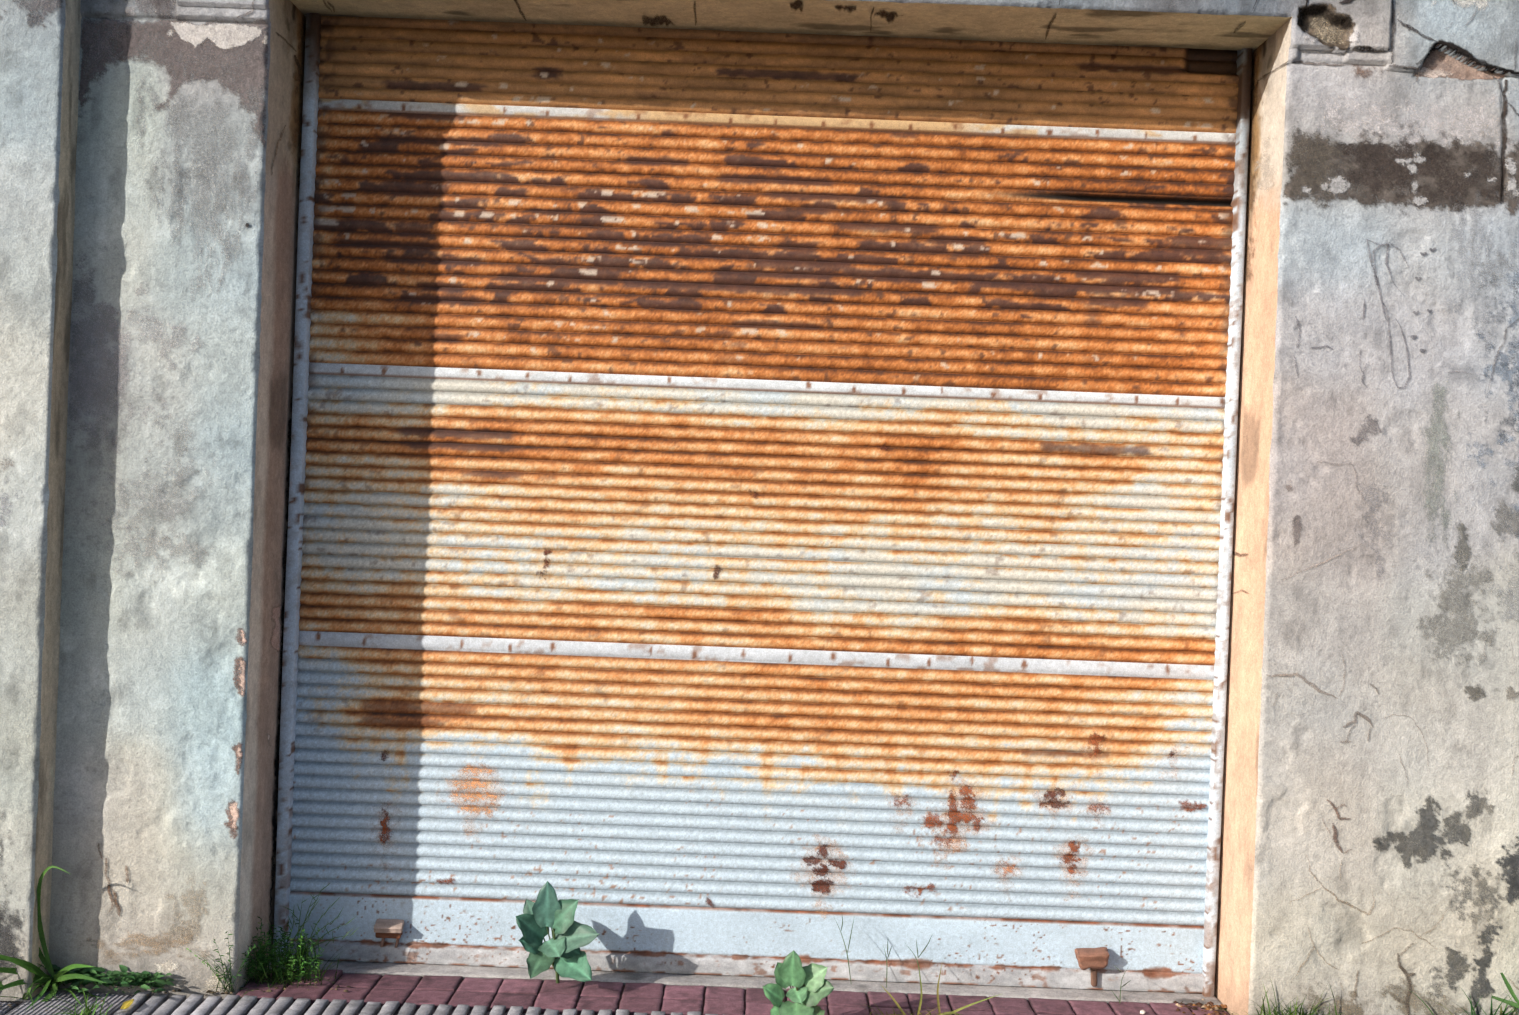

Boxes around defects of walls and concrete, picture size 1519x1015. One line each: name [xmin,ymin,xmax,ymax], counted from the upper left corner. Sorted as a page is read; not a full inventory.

spalling [1297,4,1359,50]
crack [1255,0,1476,88]
spalling [1320,39,1519,145]
crack [1495,38,1519,200]
damp [1283,126,1519,467]
damp [1420,381,1519,664]
corrosion [894,770,983,851]
corrosion [1039,787,1070,810]
damp [0,908,24,974]
corrosion [803,844,847,895]
corrosion [1063,840,1086,874]
damp [1373,791,1519,1015]